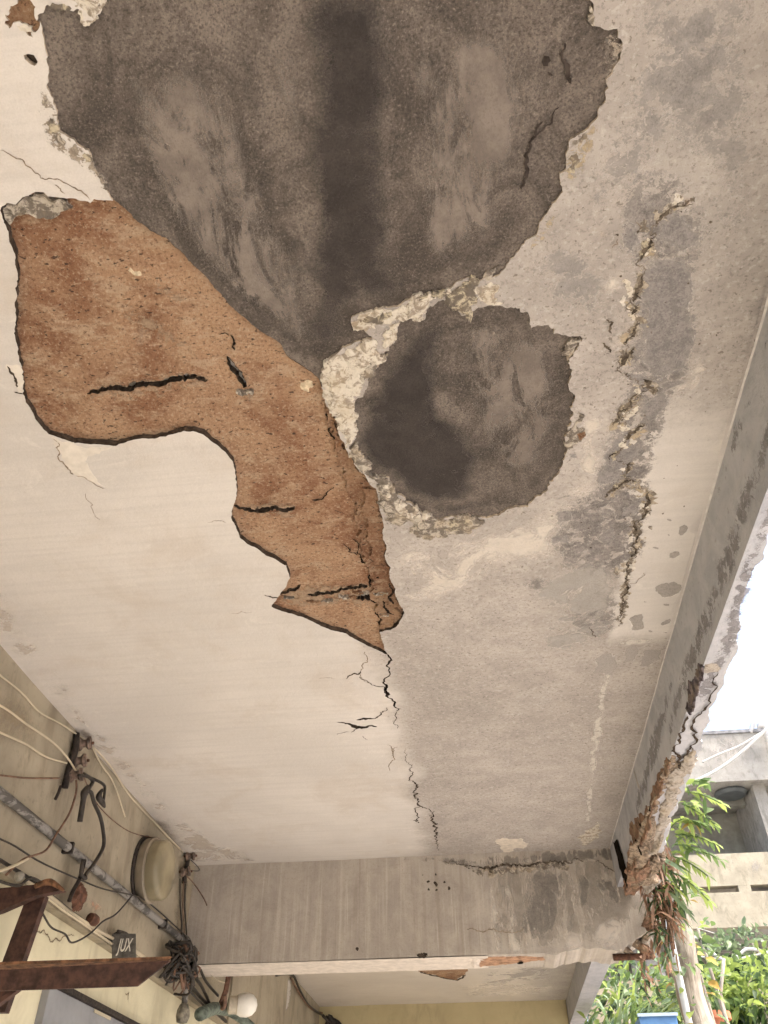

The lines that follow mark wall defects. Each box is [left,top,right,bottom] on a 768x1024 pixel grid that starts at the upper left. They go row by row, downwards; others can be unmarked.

water stain [137,0,397,341]
peeling [0,0,623,655]
water stain [360,330,485,511]
crack [520,107,559,189]
water stain [402,0,750,649]
crack [581,193,712,637]
crack [330,651,669,888]
spalling [623,755,681,896]
water stain [635,428,768,811]
spalling [685,663,722,715]